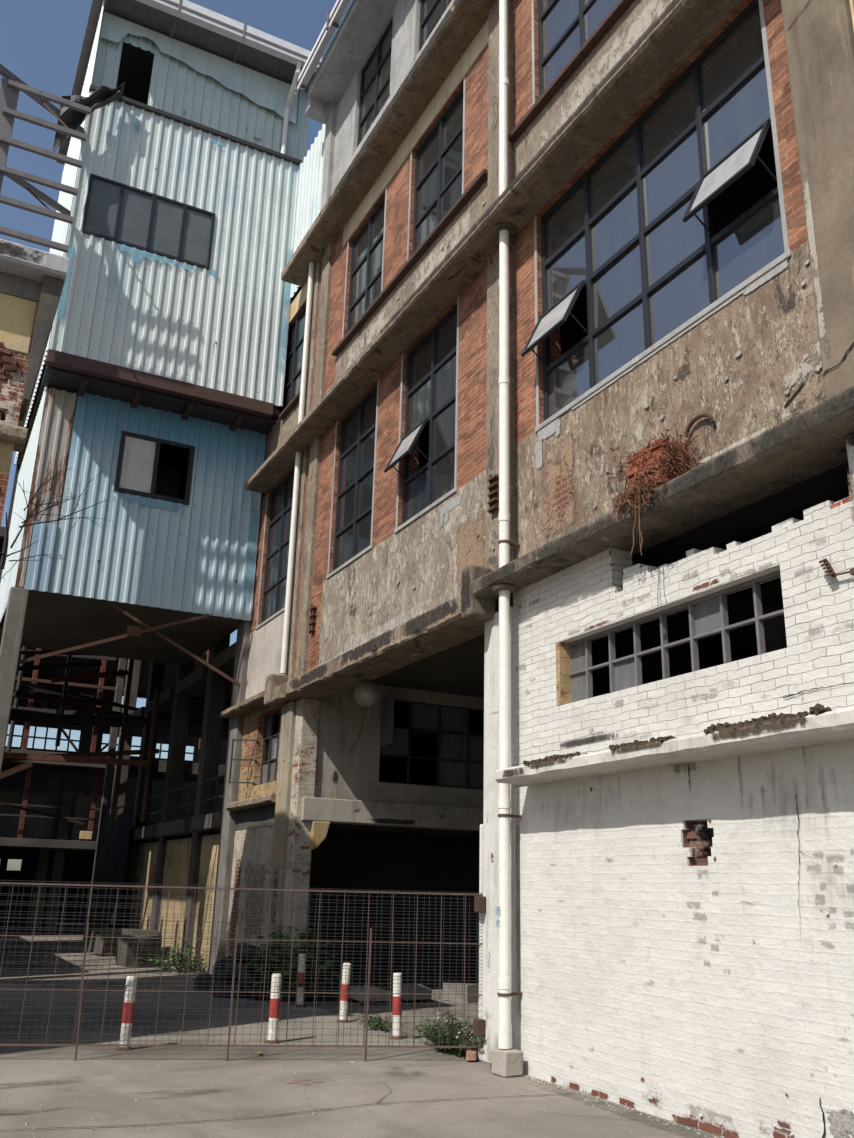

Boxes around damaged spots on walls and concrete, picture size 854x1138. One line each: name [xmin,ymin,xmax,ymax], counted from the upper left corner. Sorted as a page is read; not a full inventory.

spalling [0,342,24,421]
peeling [644,363,692,421]
crack [784,342,854,408]
flaking render [540,432,597,539]
spalling [772,518,801,532]
crack [783,682,854,698]
spalling [678,819,716,866]
spalling [551,1076,635,1108]
spalling [672,1113,739,1138]
spalling [773,1119,794,1138]
crack [818,1097,826,1138]
peeling [827,1109,854,1138]